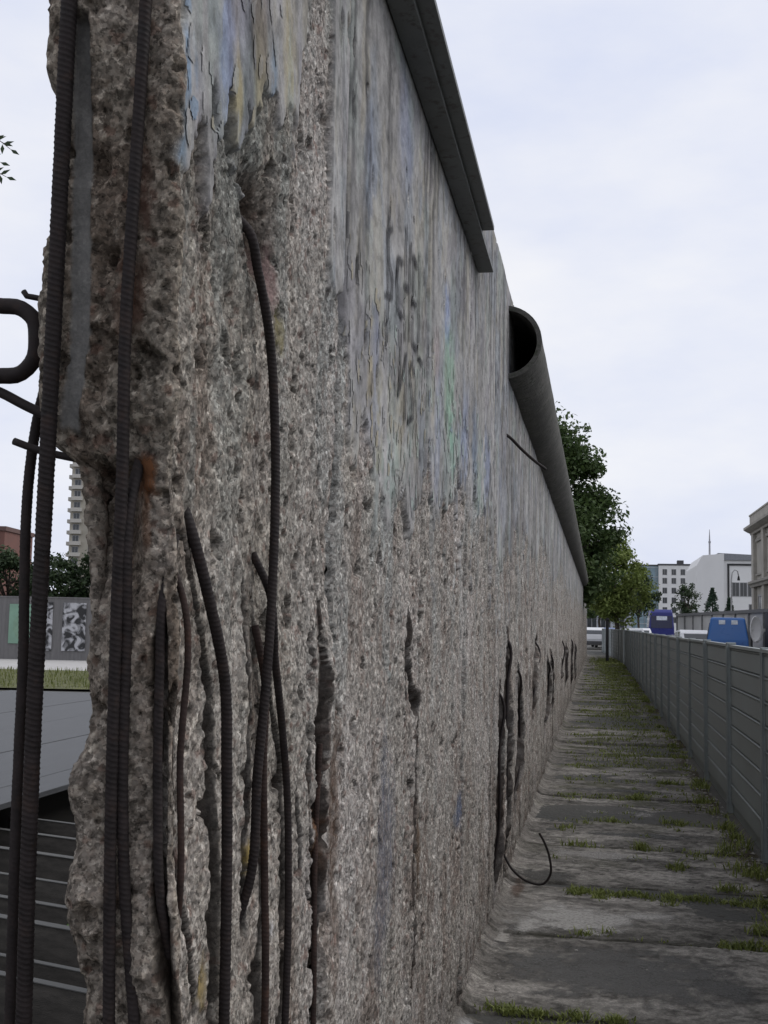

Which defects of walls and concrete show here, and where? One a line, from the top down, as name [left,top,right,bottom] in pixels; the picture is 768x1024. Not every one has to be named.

spalling [0,0,587,1024]
crack [151,527,336,1024]
crack [404,606,422,990]
crack [494,626,577,901]